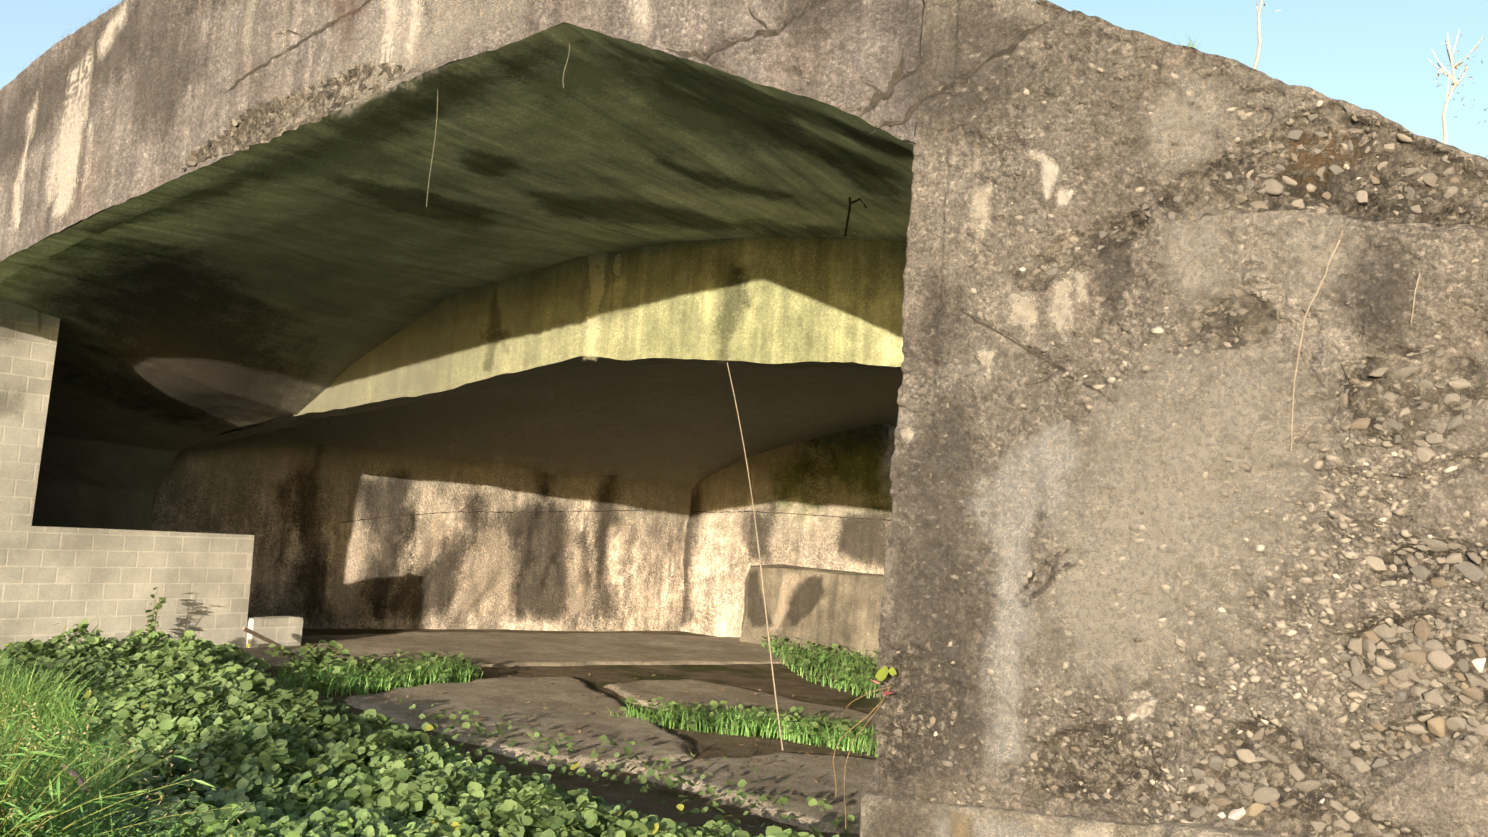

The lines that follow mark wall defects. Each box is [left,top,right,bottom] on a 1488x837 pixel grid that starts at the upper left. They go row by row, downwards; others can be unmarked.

damp [0,0,194,230]
spalling [181,62,412,172]
crack [225,0,371,93]
damp [94,0,914,237]
crack [665,0,828,74]
damp [915,15,1015,128]
spalling [1010,100,1488,349]
damp [357,470,485,619]
damp [837,355,1313,780]
spalling [1365,538,1488,592]
spalling [1338,613,1488,773]
spalling [1019,714,1435,837]